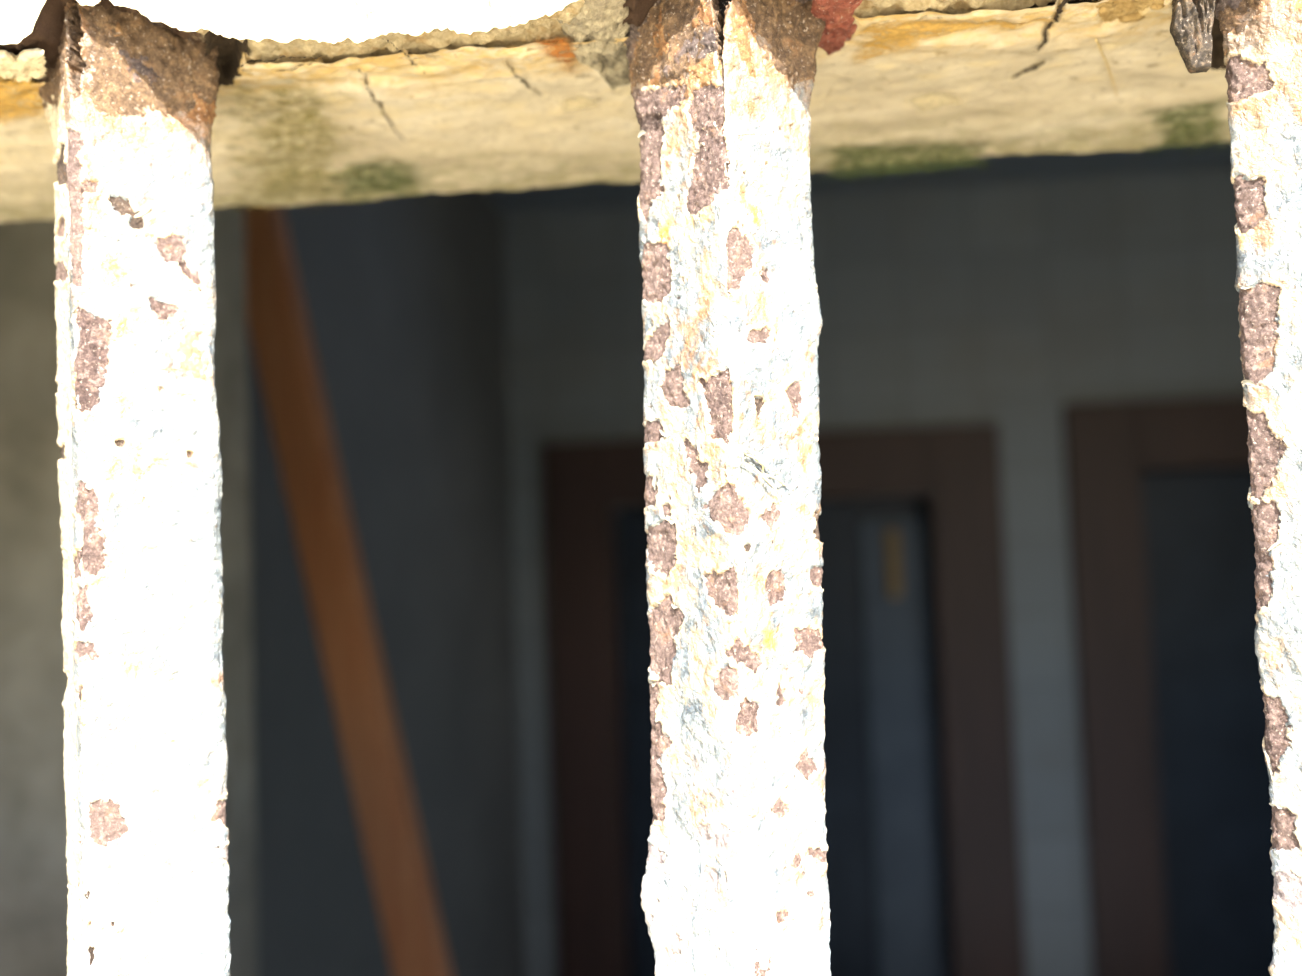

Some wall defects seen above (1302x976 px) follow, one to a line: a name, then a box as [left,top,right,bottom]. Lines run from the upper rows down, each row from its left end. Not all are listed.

corrosion [38,2,220,127]
crack [241,55,327,72]
crack [1012,0,1088,79]
crack [358,69,404,140]
corrosion [624,0,826,227]
spalling [57,144,67,186]
spalling [109,196,144,229]
corrosion [642,241,734,444]
spalling [754,397,764,420]
peeling [703,515,751,552]
corrosion [1246,407,1291,613]
corrosion [648,594,685,824]